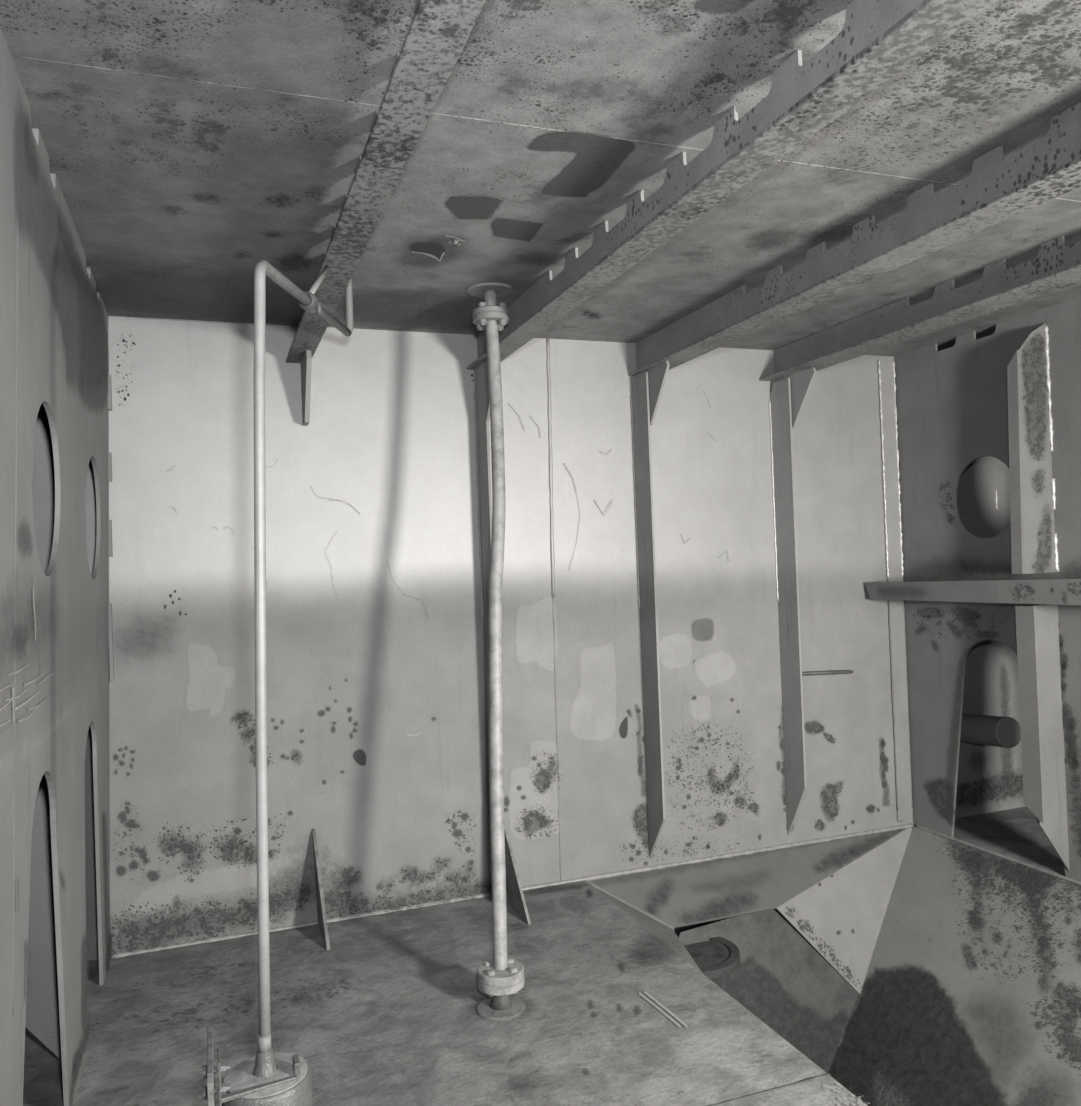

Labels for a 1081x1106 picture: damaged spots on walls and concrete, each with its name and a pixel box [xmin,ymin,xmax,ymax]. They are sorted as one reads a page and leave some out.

rust [326,0,554,112]
rust [45,90,240,175]
spalling [410,235,465,265]
rust [1022,334,1048,493]
rust [1009,507,1052,602]
rust [232,711,304,767]
rust [619,722,759,865]
rust [866,739,889,813]
rust [924,652,1023,827]
rust [1058,624,1081,856]
rust [104,797,492,970]